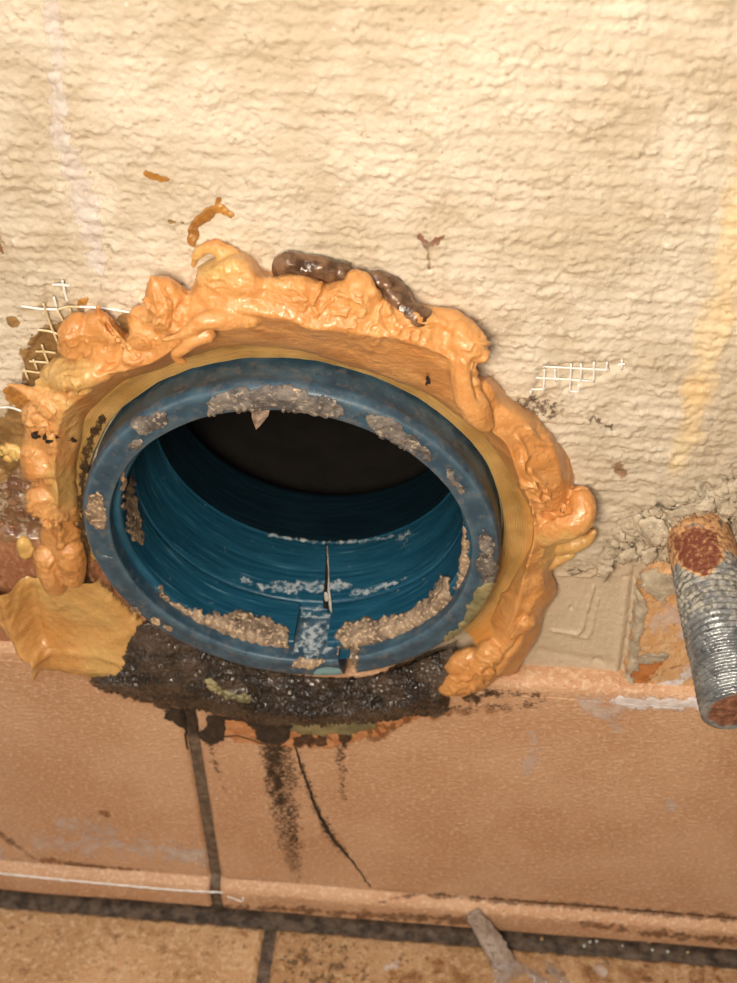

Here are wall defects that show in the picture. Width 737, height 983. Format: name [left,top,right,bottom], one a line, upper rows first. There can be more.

spalling [596,478,737,583]
leakage [259,744,305,879]
crack [294,747,386,904]